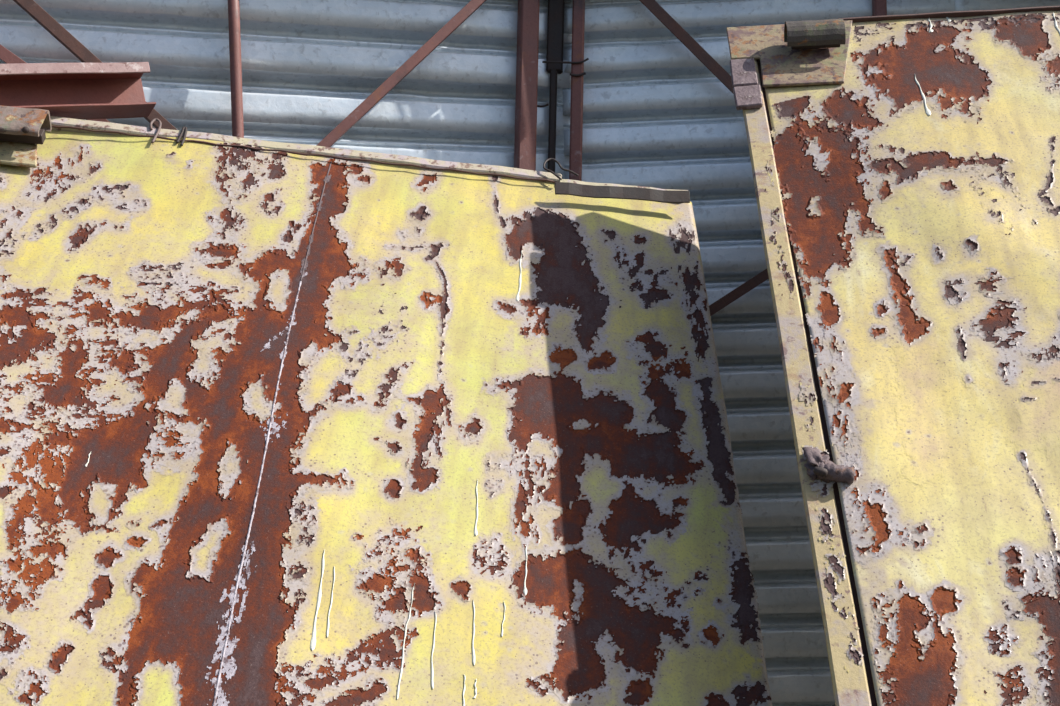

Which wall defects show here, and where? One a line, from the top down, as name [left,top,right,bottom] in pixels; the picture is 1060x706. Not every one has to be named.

peeling [0,142,245,706]
corrosion [54,157,419,706]
peeling [199,142,305,247]
peeling [328,169,443,429]
peeling [349,517,442,625]
peeling [472,451,550,579]
corrosion [479,206,742,706]
peeling [799,313,864,673]
corrosion [770,13,1060,345]
corrosion [869,579,966,706]
peeling [942,267,1031,384]
peeling [980,545,1033,706]